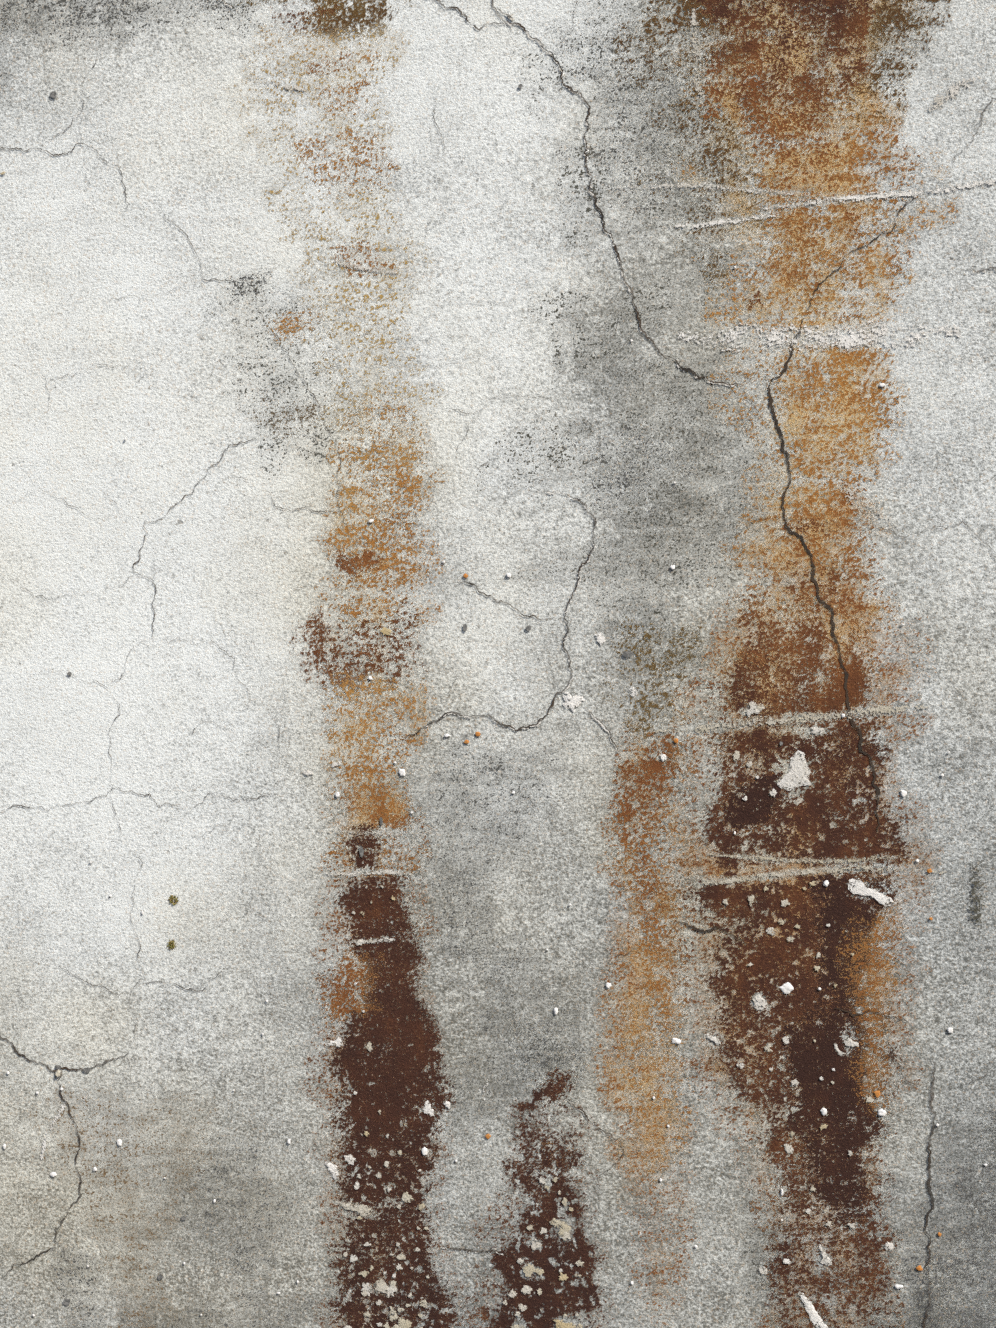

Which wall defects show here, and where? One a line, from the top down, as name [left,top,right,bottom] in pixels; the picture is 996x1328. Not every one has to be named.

crack [0,0,131,213]
crack [164,215,393,530]
crack [437,0,962,832]
crack [9,410,293,995]
crack [401,488,620,752]
corrosion [225,0,961,1328]
crack [0,1027,244,1277]